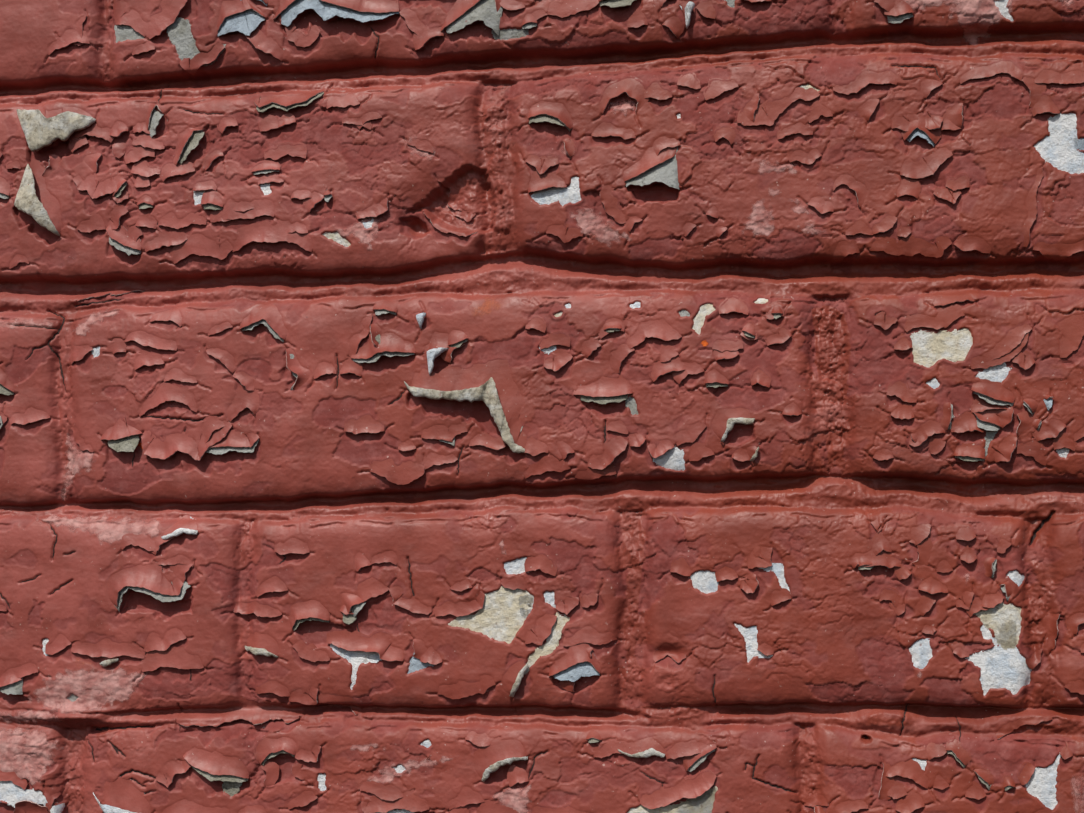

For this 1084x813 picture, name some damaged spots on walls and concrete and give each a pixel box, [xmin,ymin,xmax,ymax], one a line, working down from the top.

peeling [113,0,648,76]
peeling [0,86,307,264]
peeling [525,99,581,206]
peeling [600,136,681,232]
peeling [960,59,1084,261]
peeling [344,295,792,485]
peeling [873,289,1084,466]
peeling [93,515,646,813]
peeling [851,515,1084,696]
peeling [0,770,65,813]
peeling [586,730,718,813]
peeling [799,725,1073,813]